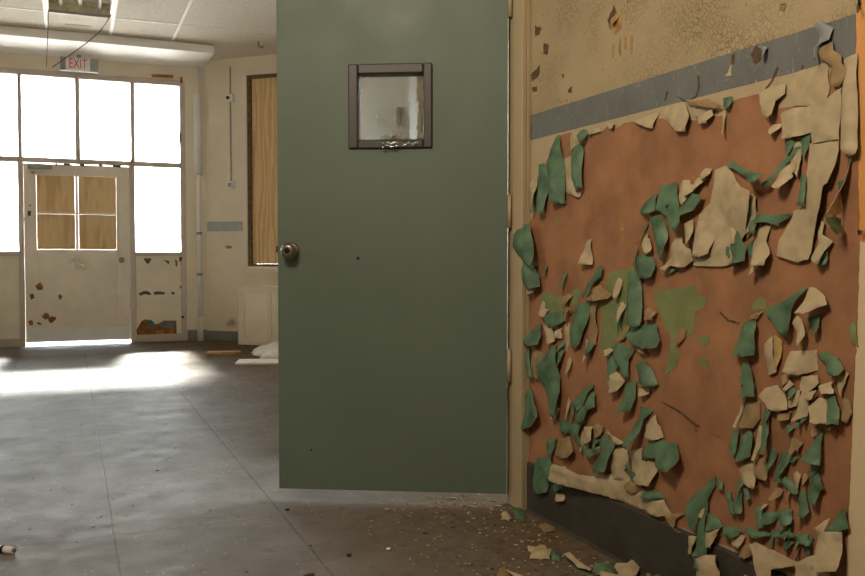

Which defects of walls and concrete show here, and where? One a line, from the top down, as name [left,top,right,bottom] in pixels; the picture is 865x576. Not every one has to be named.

spalling [607,6,632,58]
peeling [512,20,860,576]